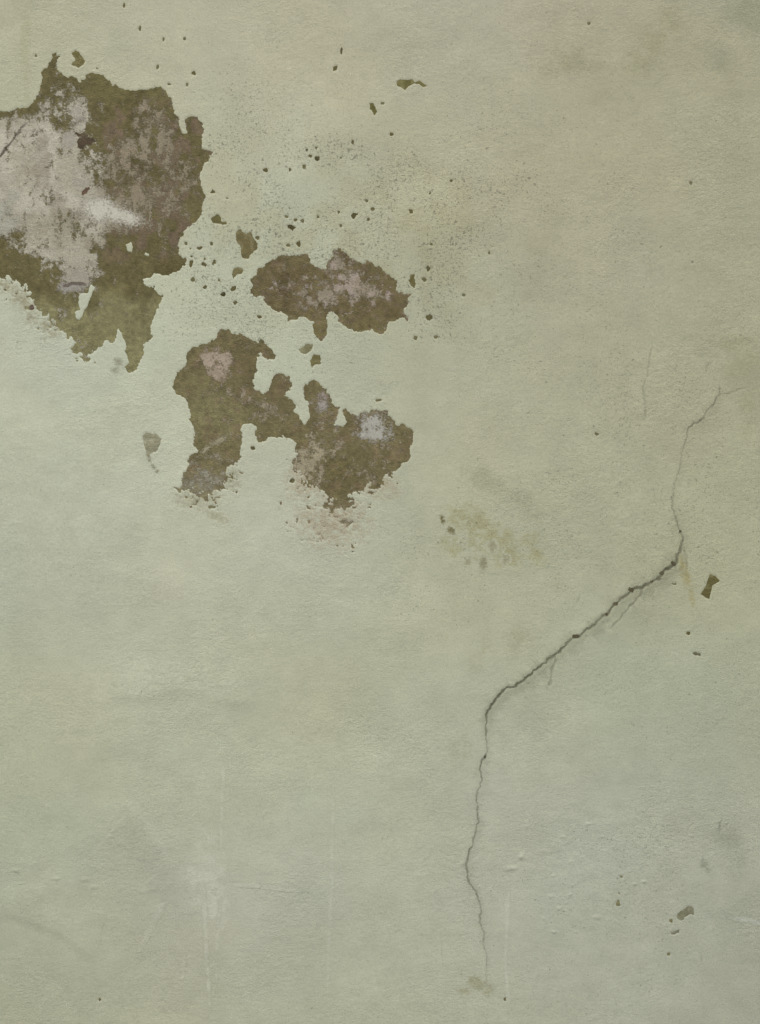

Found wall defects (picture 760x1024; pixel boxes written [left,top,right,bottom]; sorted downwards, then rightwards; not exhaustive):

peeling [0,50,430,376]
peeling [161,329,414,561]
crack [605,561,676,616]
peeling [701,574,720,599]
crack [486,634,580,714]